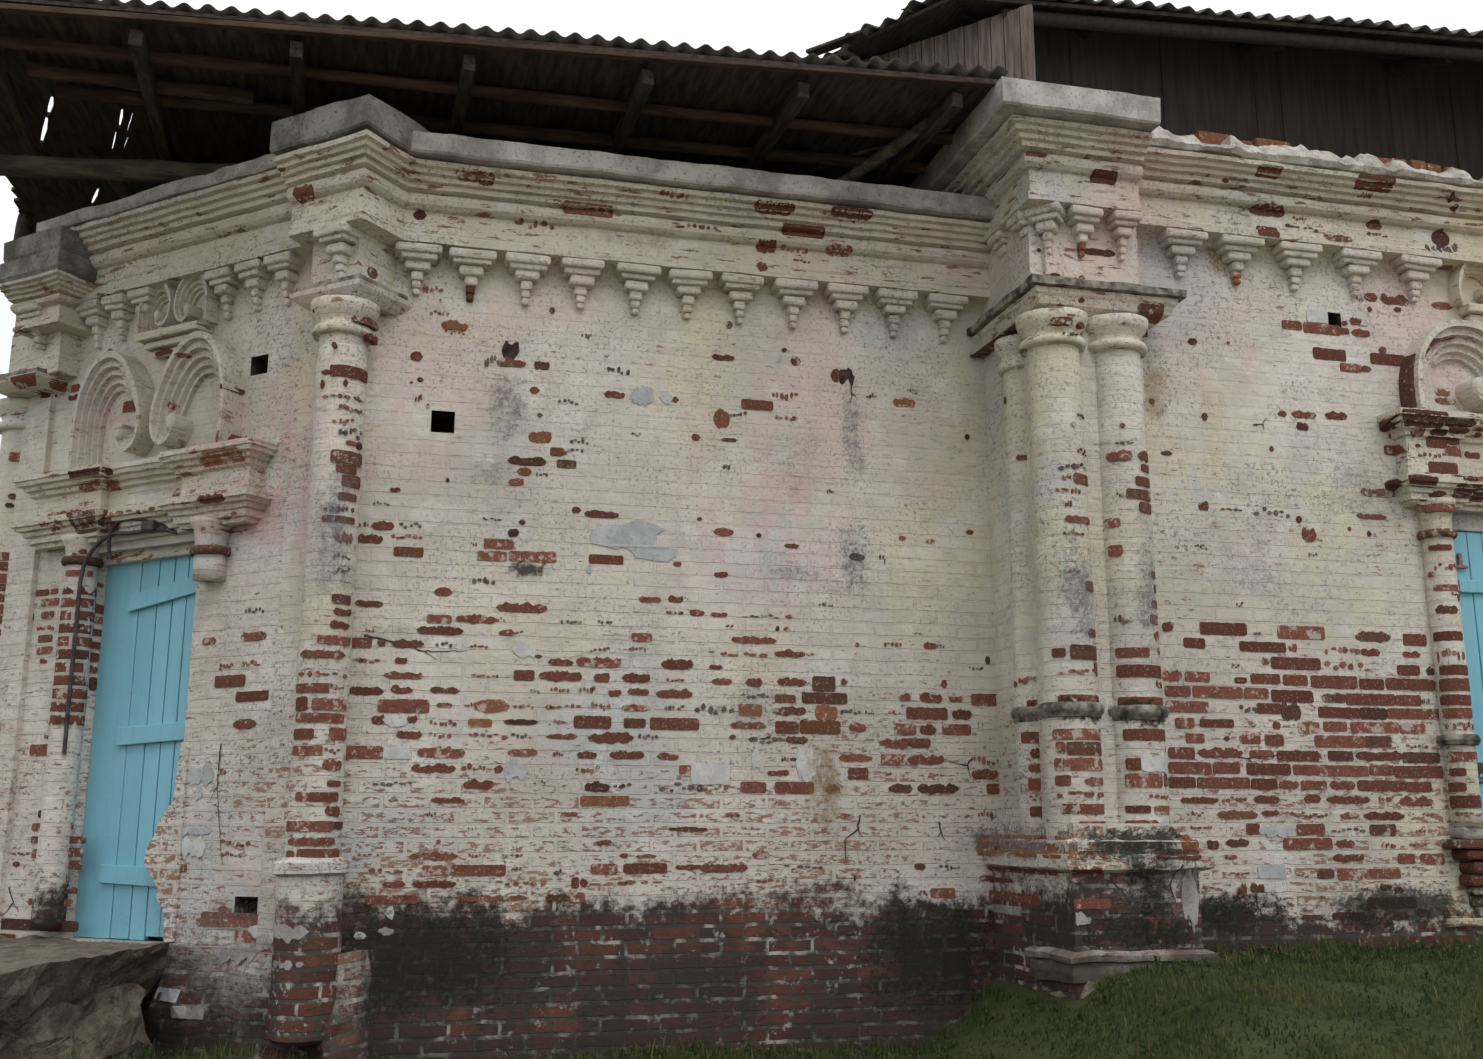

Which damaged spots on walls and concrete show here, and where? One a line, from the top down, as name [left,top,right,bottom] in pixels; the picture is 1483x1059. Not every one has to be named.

flaking render [754,199,874,271]
spalling [220,354,269,395]
spalling [409,351,455,433]
spalling [484,341,550,394]
peeling [507,413,589,486]
flaking render [713,392,799,442]
flaking render [1281,293,1409,373]
flaking render [471,517,557,585]
flaking render [29,466,155,756]
flaking render [214,660,269,729]
flaking render [1113,544,1482,898]
flaking render [196,896,258,950]